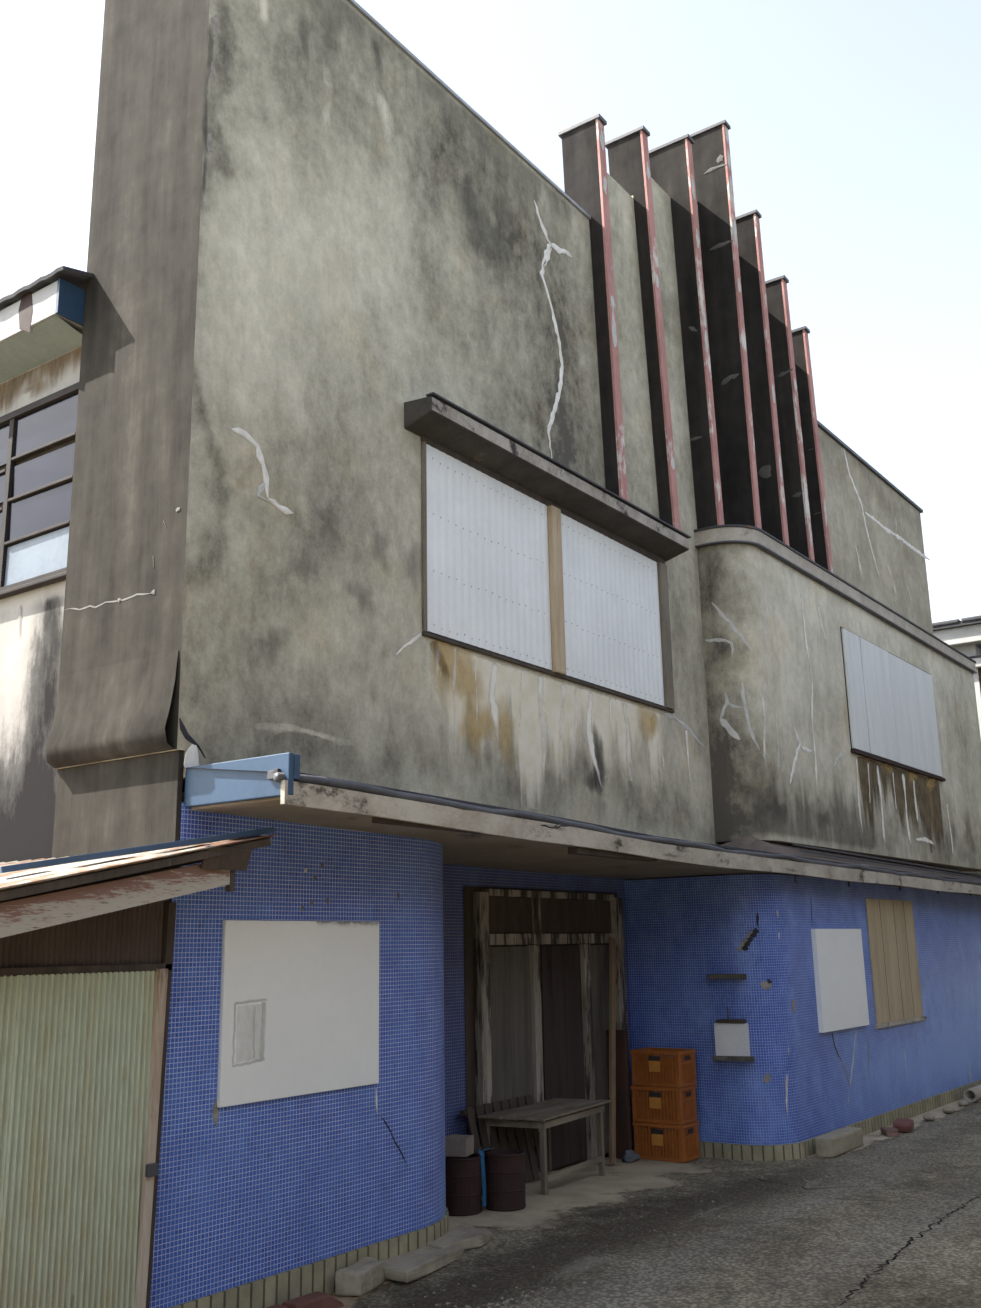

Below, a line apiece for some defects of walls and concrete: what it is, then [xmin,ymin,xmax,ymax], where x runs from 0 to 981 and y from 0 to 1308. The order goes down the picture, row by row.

crack [533,200,572,458]
crack [231,427,293,515]
crack [808,448,930,577]
crack [665,603,760,779]
crack [790,725,844,784]